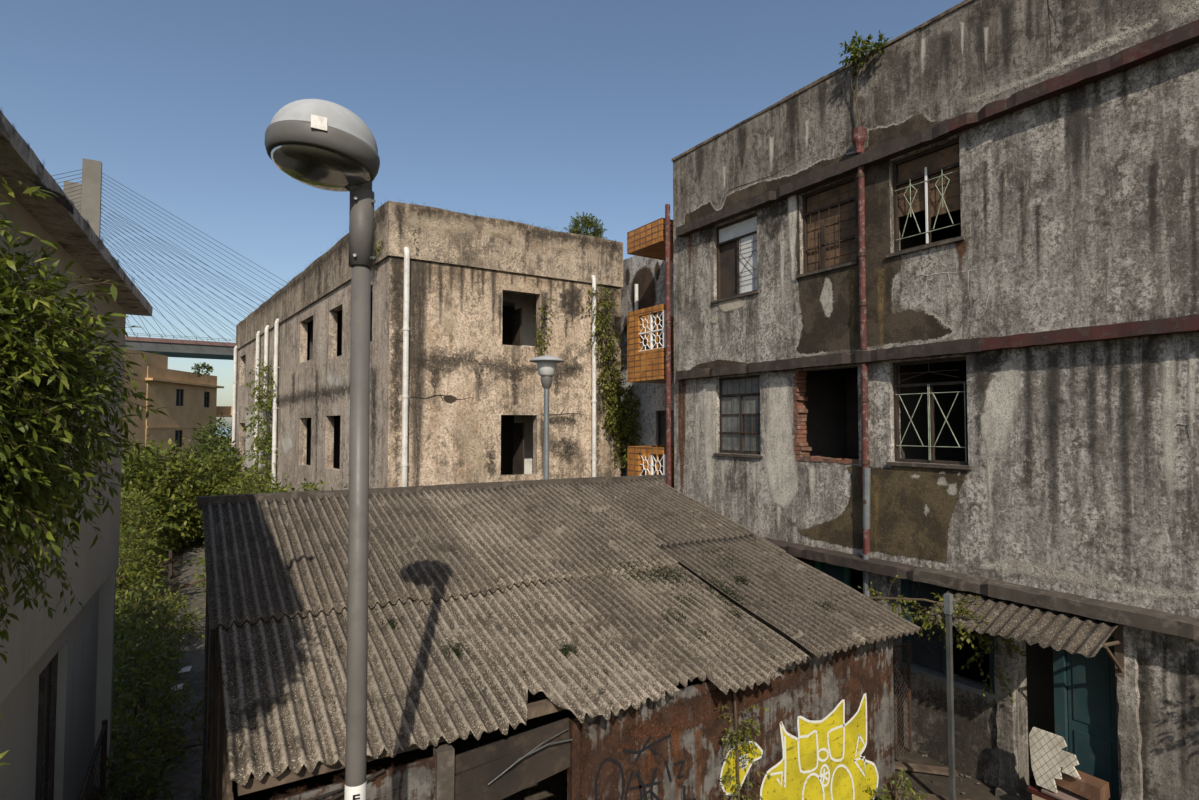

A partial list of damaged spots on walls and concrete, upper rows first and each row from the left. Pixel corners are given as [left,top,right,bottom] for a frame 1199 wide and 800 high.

leakage [245,370,350,474]
leakage [390,257,538,486]
leakage [500,221,618,258]
leakage [537,276,582,335]
leakage [541,416,578,463]
leakage [596,285,618,476]
flaking render [684,111,958,357]
flaking render [800,462,969,563]
leakage [974,350,1032,498]
leakage [1048,345,1076,545]
leakage [1090,340,1196,528]
rust [618,665,813,800]